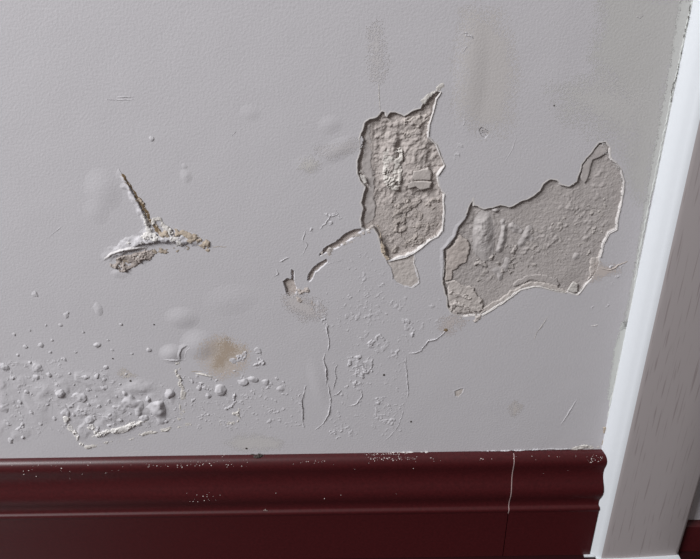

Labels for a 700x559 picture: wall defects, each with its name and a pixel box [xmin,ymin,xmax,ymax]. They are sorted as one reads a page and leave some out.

peeling [281,268,298,298]
flaking render [306,91,625,317]